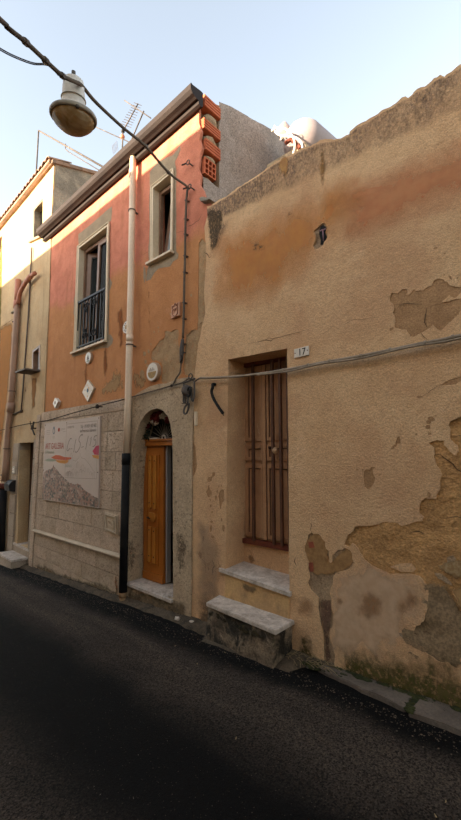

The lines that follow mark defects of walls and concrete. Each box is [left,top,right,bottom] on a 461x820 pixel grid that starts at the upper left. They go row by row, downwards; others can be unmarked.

damp [207,70,457,250]
peeling [133,239,206,388]
peeling [390,274,461,337]
peeling [305,417,461,667]